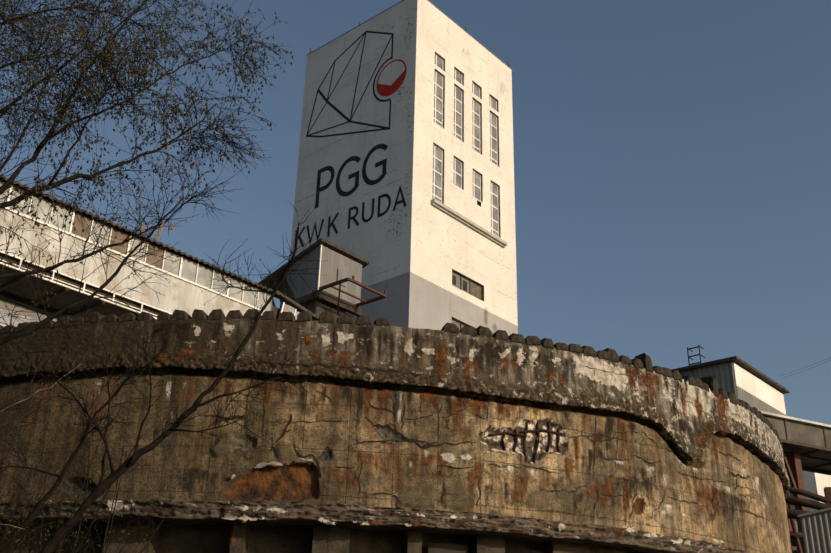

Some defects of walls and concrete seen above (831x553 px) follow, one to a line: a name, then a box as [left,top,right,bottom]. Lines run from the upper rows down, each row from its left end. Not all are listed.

peeling [499,346,539,367]
peeling [551,353,647,397]
rust [626,366,660,399]
peeling [660,375,763,436]
spalling [477,418,569,464]
spalling [221,446,334,522]
spalling [633,498,646,515]
peeling [626,526,693,545]